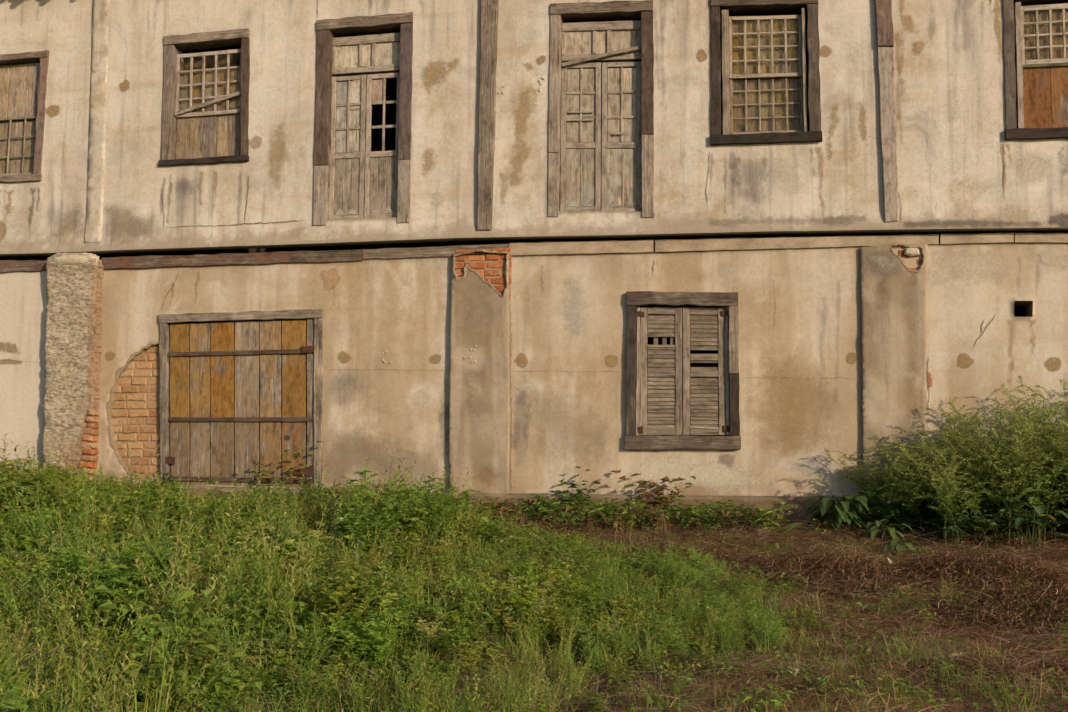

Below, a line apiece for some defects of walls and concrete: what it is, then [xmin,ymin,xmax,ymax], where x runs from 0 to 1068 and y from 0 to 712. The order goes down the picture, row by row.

flaking render [424,59,458,90]
flaking render [500,64,545,195]
flaking render [452,248,512,301]
flaking render [889,242,925,273]
flaking render [0,342,21,364]
flaking render [75,341,170,481]